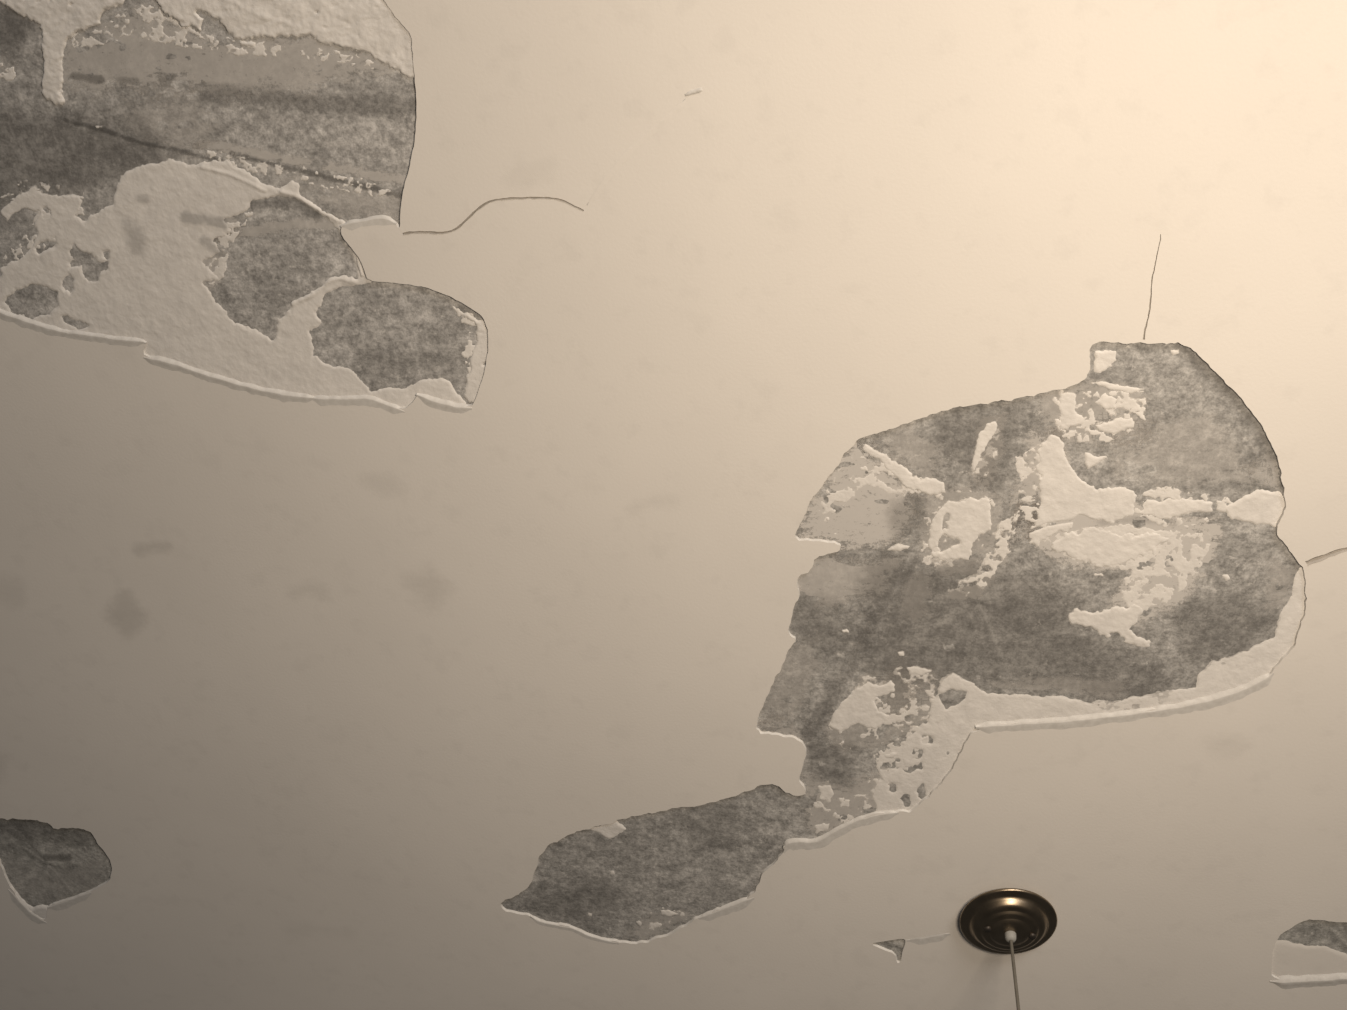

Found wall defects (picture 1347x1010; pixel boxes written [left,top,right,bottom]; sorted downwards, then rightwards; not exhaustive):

peeling [0,0,488,414]
crack [403,88,702,235]
crack [1143,234,1161,340]
crack [1305,547,1347,566]
peeling [500,341,1310,944]
peeling [0,818,112,924]
peeling [873,933,950,963]
peeling [1270,919,1347,989]